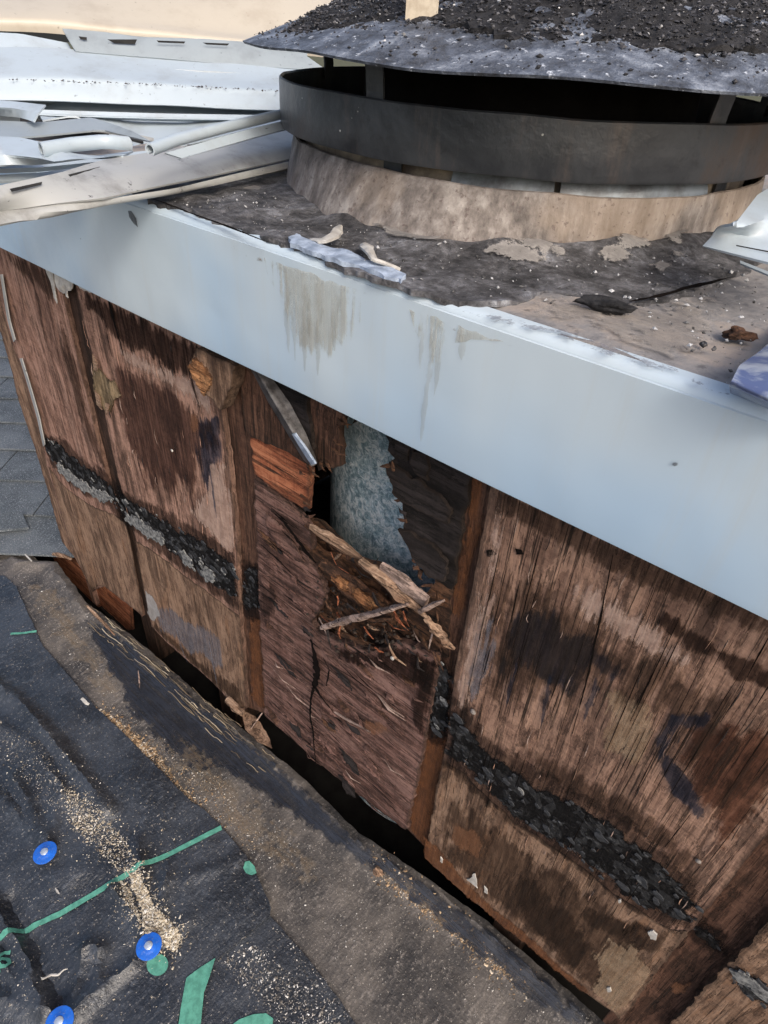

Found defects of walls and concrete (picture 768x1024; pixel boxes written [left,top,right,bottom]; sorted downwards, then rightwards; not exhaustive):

damp [84,293,222,512]
crack [309,639,332,766]
spalling [287,517,422,691]
damp [470,612,619,724]
damp [657,713,710,819]
damp [659,612,768,688]